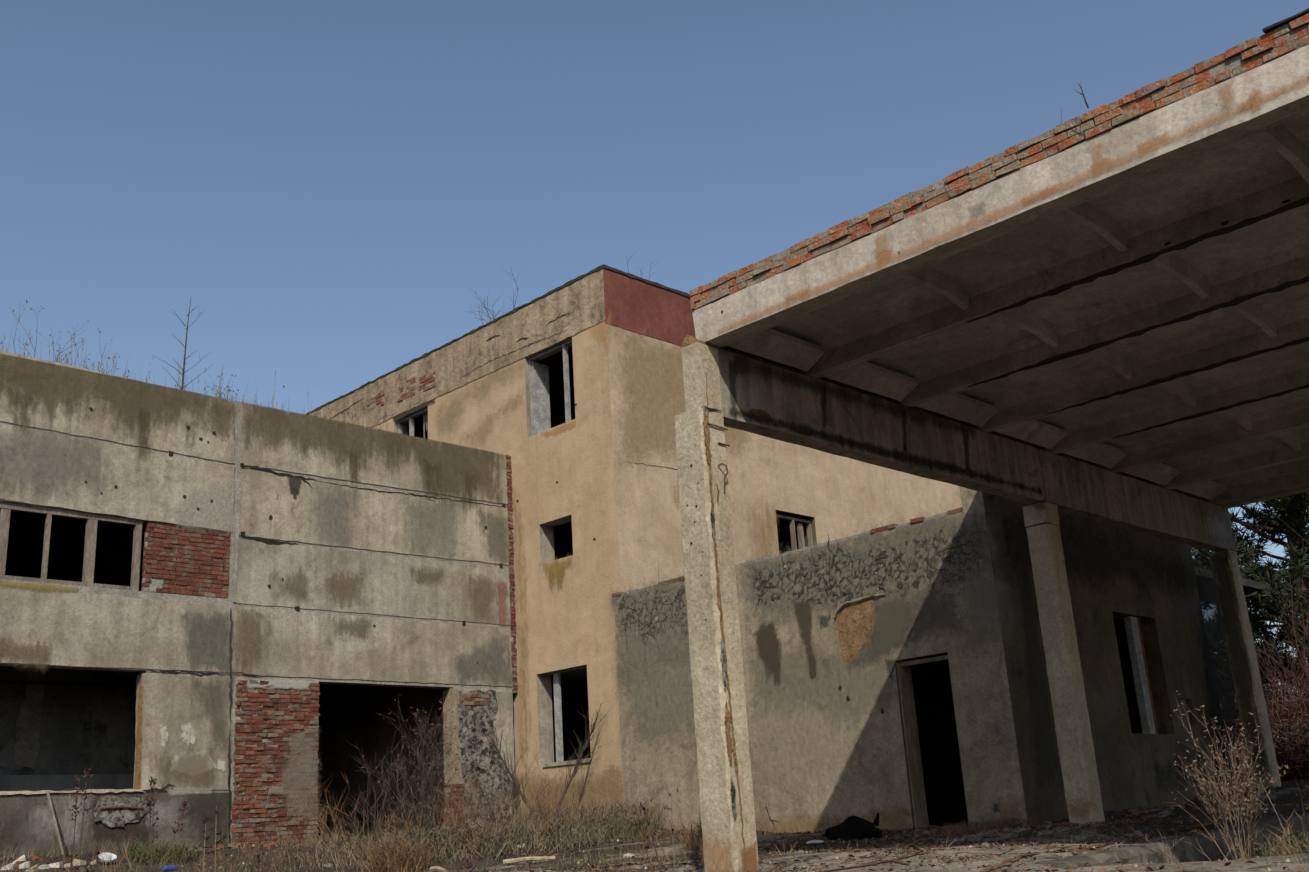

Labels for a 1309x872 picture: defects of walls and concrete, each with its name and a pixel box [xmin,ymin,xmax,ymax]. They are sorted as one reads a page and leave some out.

damp [0,354,499,557]
crack [244,466,502,507]
damp [481,515,519,562]
peeling [618,588,687,641]
spalling [686,373,746,867]
spalling [752,529,988,664]
damp [729,355,1044,509]
damp [748,516,1057,775]
peeling [444,689,513,824]